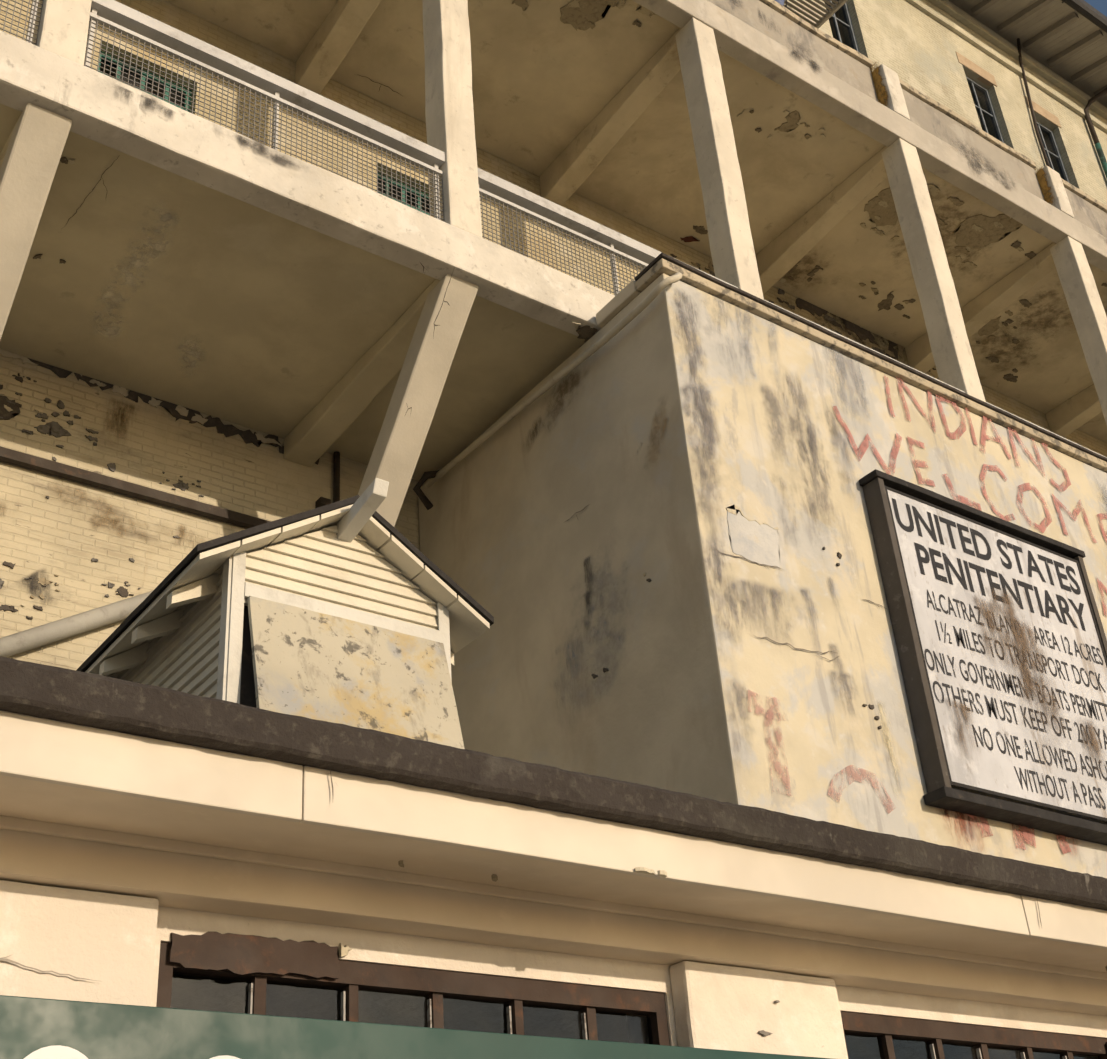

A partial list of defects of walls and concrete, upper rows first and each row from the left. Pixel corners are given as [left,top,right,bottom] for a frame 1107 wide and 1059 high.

peeling [560,0,655,31]
peeling [860,187,900,242]
peeling [927,184,979,206]
peeling [935,214,1036,270]
peeling [976,299,1032,344]
peeling [1003,368,1018,382]
peeling [0,349,284,462]
water stain [691,352,713,447]
water stain [766,381,816,463]
peeling [0,574,60,619]
crack [0,955,96,981]
peeling [168,931,352,979]